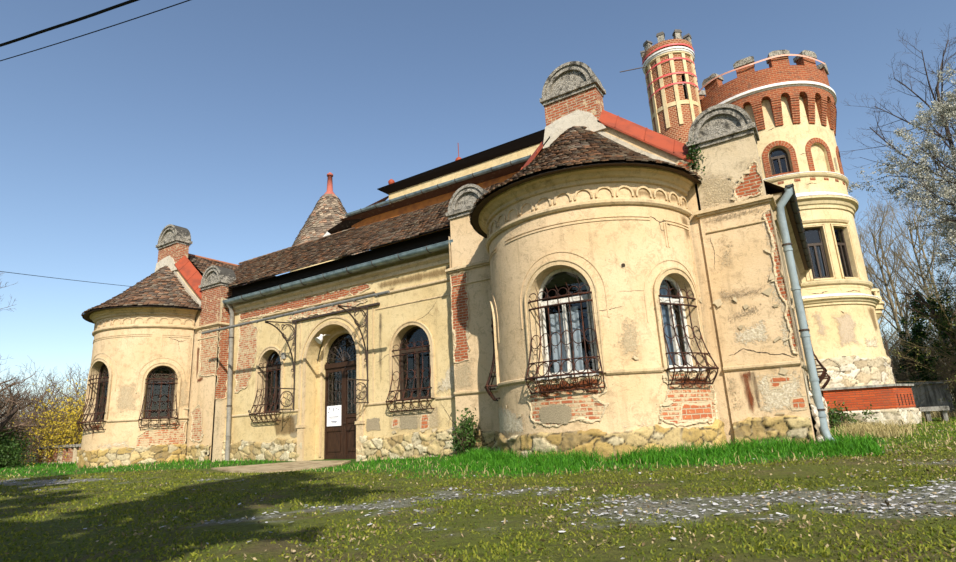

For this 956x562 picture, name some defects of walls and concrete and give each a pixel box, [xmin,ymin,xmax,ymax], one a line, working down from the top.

spalling [95,404,204,449]
spalling [198,283,370,400]
spalling [388,271,475,434]
spalling [499,376,609,436]
spalling [618,371,719,430]
spalling [676,159,823,417]